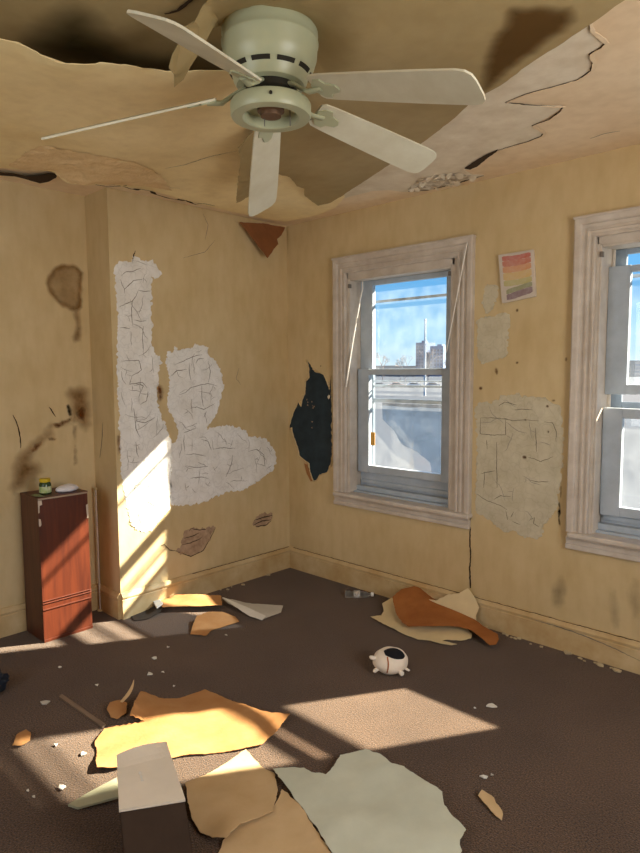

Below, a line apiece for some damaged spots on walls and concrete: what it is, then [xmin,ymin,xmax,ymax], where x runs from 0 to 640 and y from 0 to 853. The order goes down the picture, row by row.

damp [487,10,568,87]
flaking render [344,23,610,198]
peeling [239,222,285,258]
damp [48,266,82,309]
peeling [476,284,510,364]
damp [55,392,86,427]
peeling [113,256,277,533]
spalling [289,359,333,482]
peeling [474,392,564,540]
spalling [161,526,215,557]
crack [193,527,640,661]